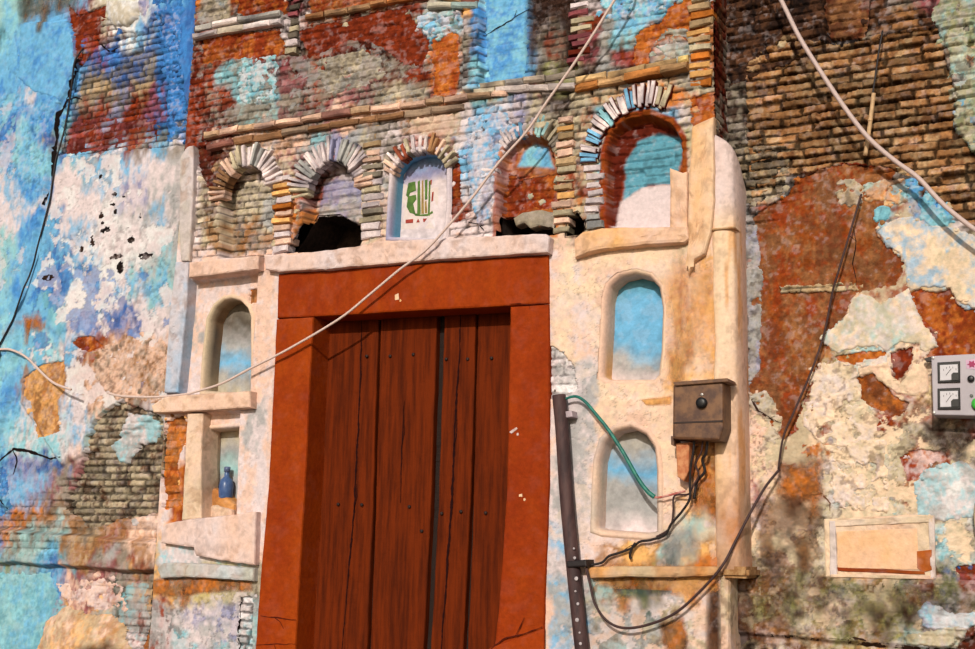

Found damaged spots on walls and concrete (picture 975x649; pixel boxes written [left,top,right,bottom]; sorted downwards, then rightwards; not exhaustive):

flaking render [79,192,125,252]
flaking render [109,253,124,274]
flaking render [725,0,975,522]
flaking render [24,362,66,438]
flaking render [66,332,188,528]
flaking render [551,346,578,399]
crack [0,448,60,475]
water stain [738,496,839,649]
flaking render [956,564,975,580]
peeling [0,571,128,649]
water stain [843,587,942,639]
peeling [905,601,975,649]